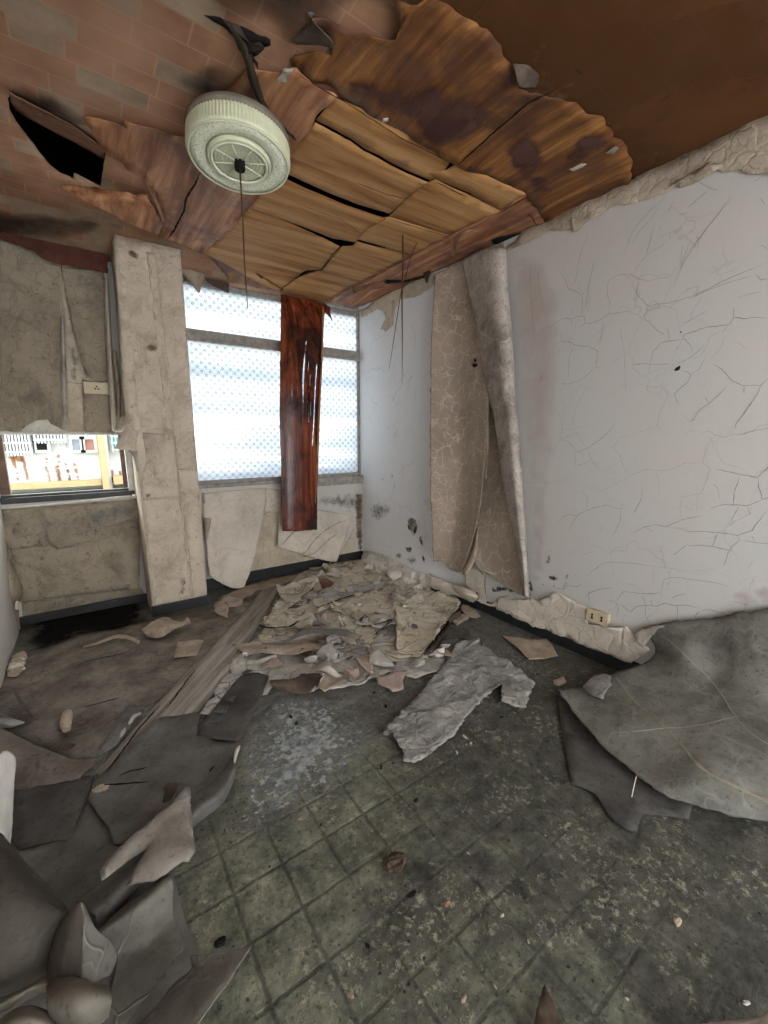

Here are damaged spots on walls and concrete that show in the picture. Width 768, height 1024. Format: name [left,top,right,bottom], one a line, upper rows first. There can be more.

peeling [83,116,284,292]
crack [167,172,201,240]
damp [351,83,485,145]
peeling [227,0,633,314]
damp [509,140,547,189]
damp [439,0,768,180]
crack [530,262,768,622]